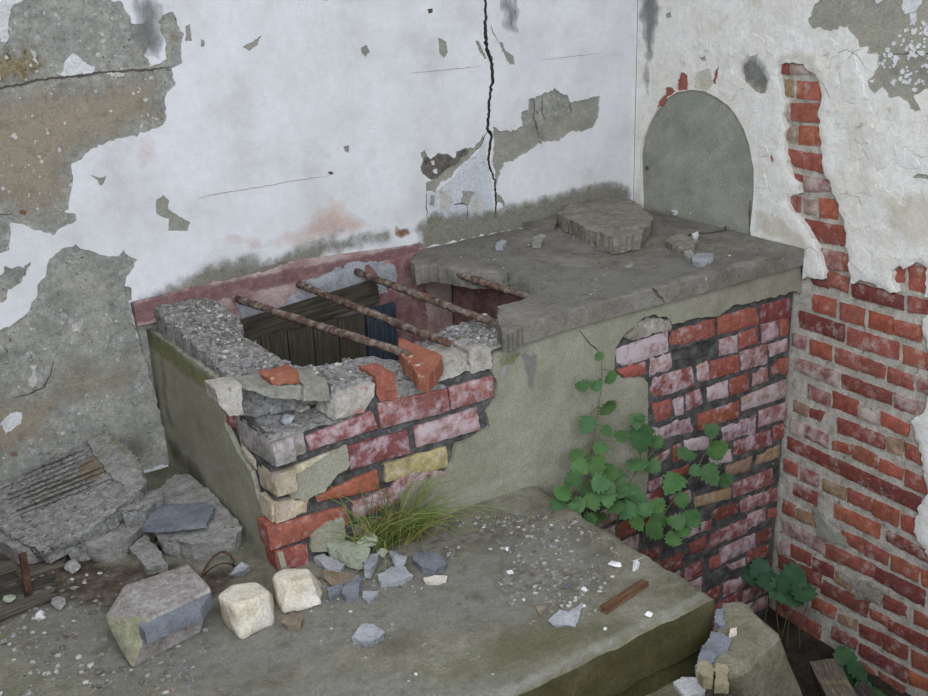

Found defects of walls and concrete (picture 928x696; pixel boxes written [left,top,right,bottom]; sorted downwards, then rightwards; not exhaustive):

peeling [0,0,204,253]
crack [475,0,514,212]
spalling [421,89,599,221]
peeling [808,0,928,112]
peeling [0,245,169,484]
flaking render [204,338,494,572]
flaking render [581,63,928,696]